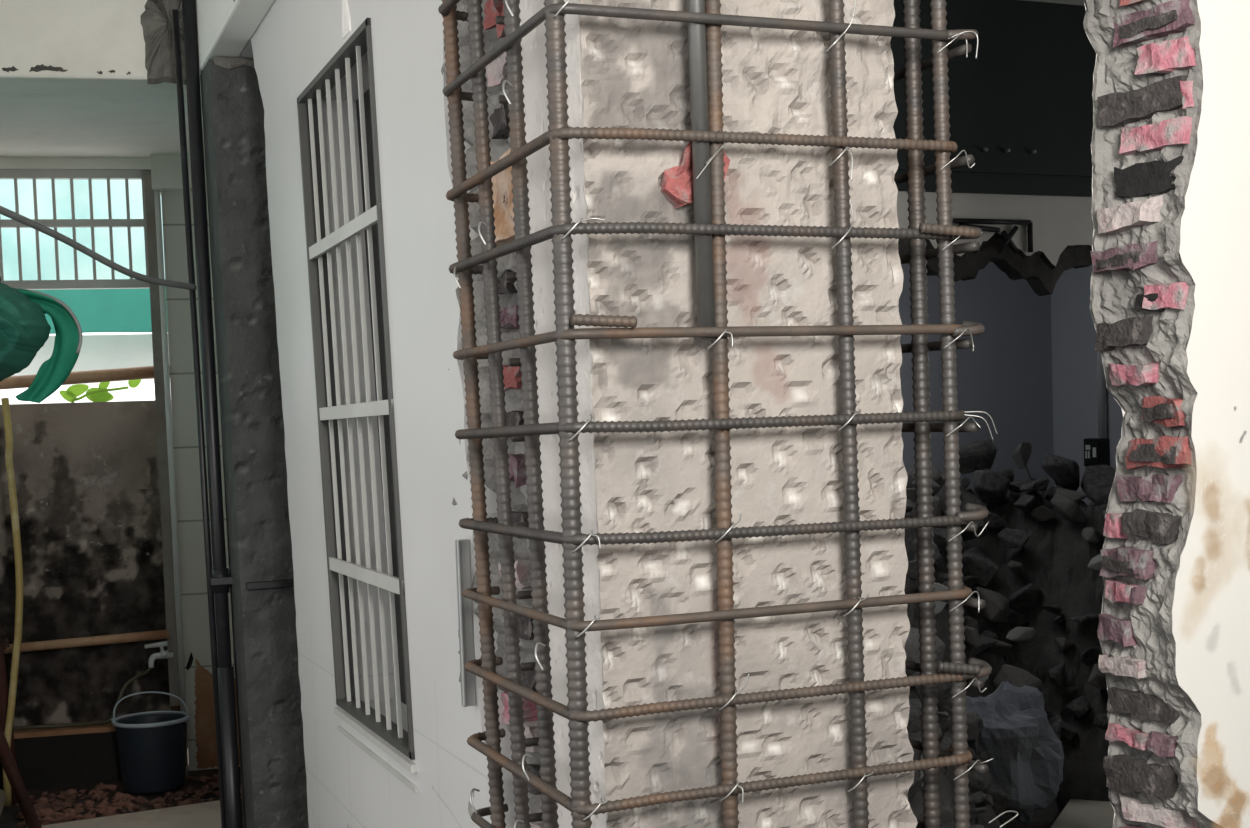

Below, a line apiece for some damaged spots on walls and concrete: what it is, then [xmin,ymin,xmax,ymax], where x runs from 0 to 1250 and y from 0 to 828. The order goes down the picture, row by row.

peeling [2,64,68,73]
spalling [140,0,186,85]
spalling [897,191,910,264]
spalling [924,0,1223,828]
water stain [0,519,170,726]